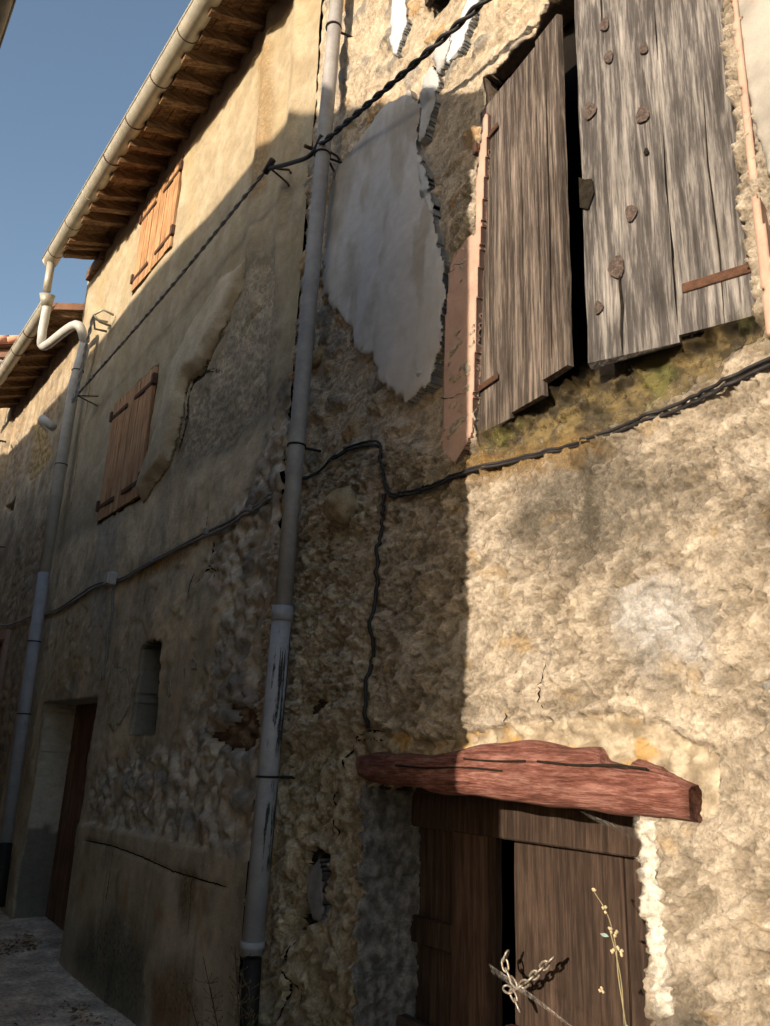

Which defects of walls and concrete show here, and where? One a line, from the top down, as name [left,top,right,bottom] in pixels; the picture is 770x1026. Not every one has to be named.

flaking render [738,0,770,176]
flaking render [322,0,482,405]
crack [85,840,228,937]